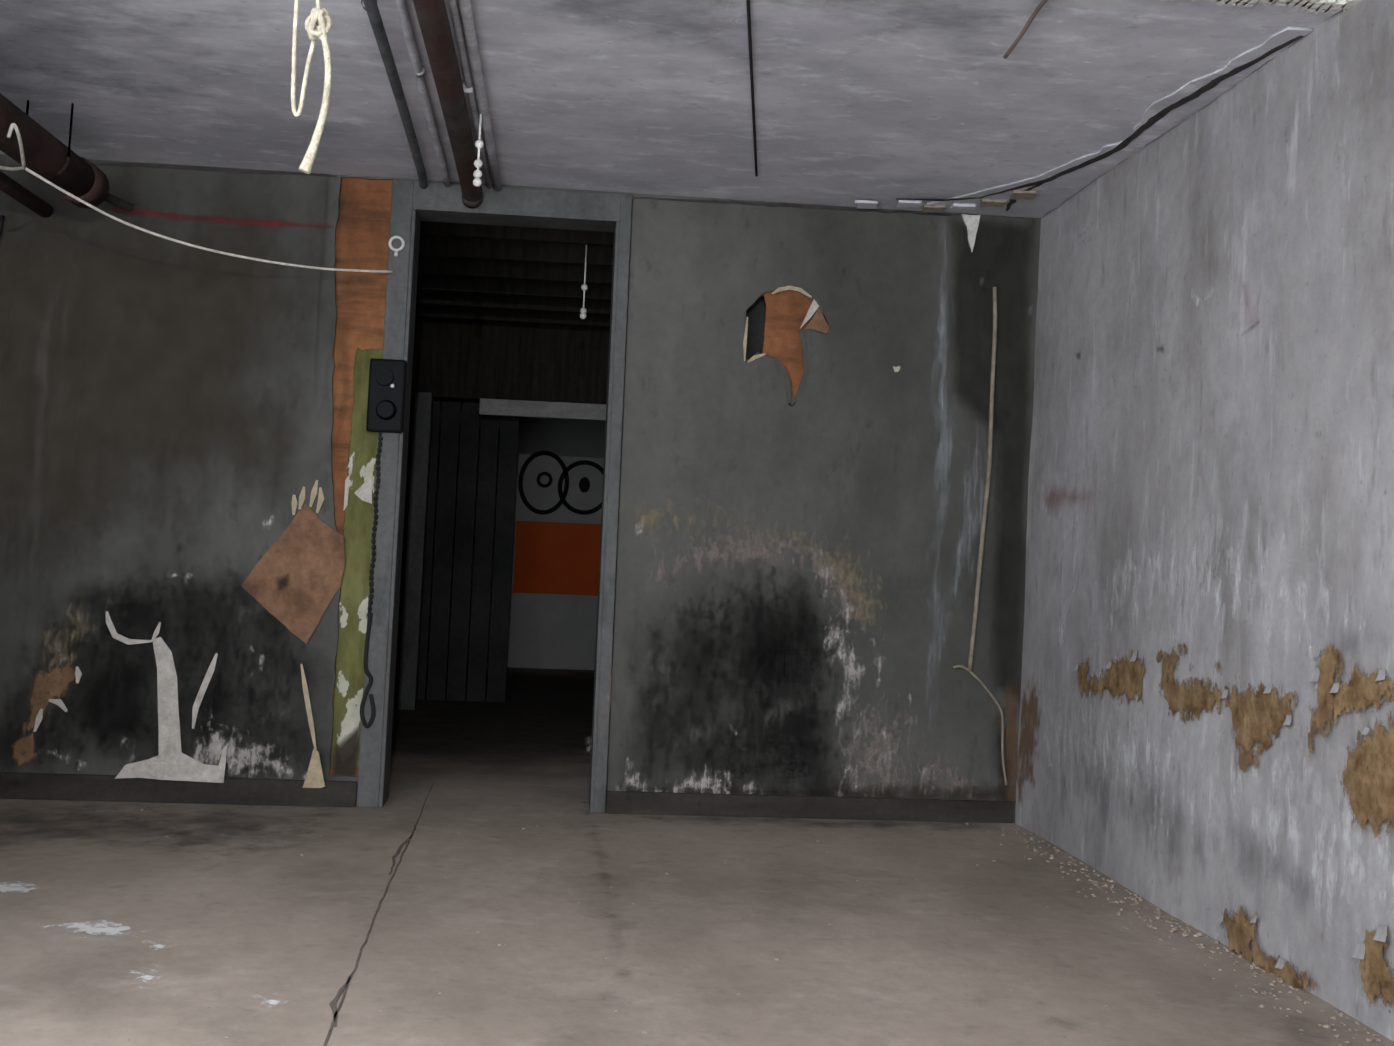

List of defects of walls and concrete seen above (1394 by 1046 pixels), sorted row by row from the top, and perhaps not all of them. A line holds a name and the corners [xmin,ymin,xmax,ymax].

spalling [743,286,830,406]
water stain [0,574,307,780]
peeling [241,348,383,788]
water stain [654,530,967,796]
peeling [1073,642,1394,839]
crack [323,785,433,1046]
peeling [1216,906,1315,994]
peeling [1352,924,1394,1013]